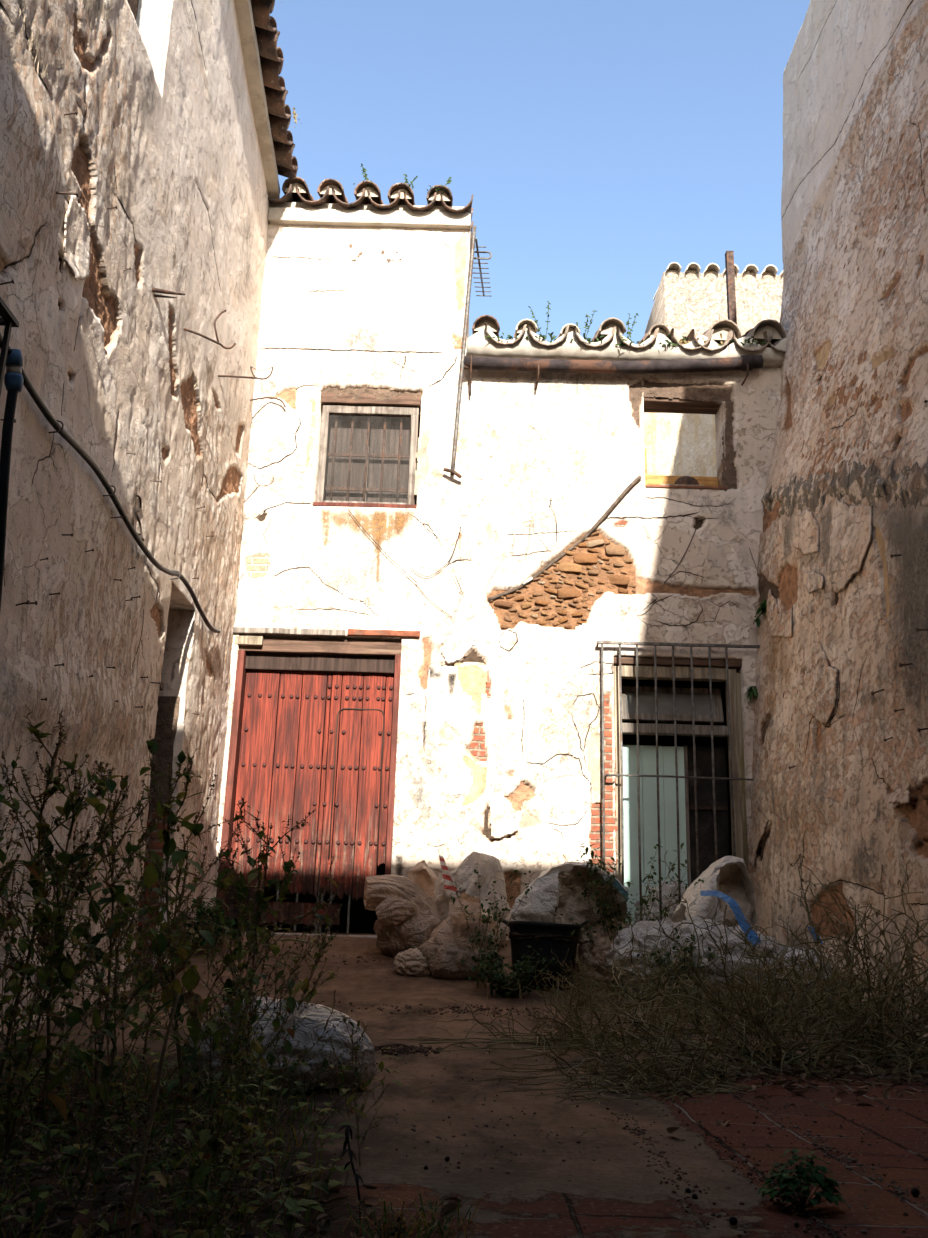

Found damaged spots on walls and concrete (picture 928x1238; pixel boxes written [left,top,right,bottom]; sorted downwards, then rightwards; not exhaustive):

crack [3,196,69,270]
peeling [59,140,117,347]
spalling [168,309,218,456]
crack [249,385,314,469]
crack [260,347,457,390]
crack [256,502,386,622]
crack [408,512,566,599]
crack [605,497,731,521]
spalling [485,499,890,638]
spalling [418,629,542,842]
spalling [531,694,618,872]
spalling [888,785,928,858]